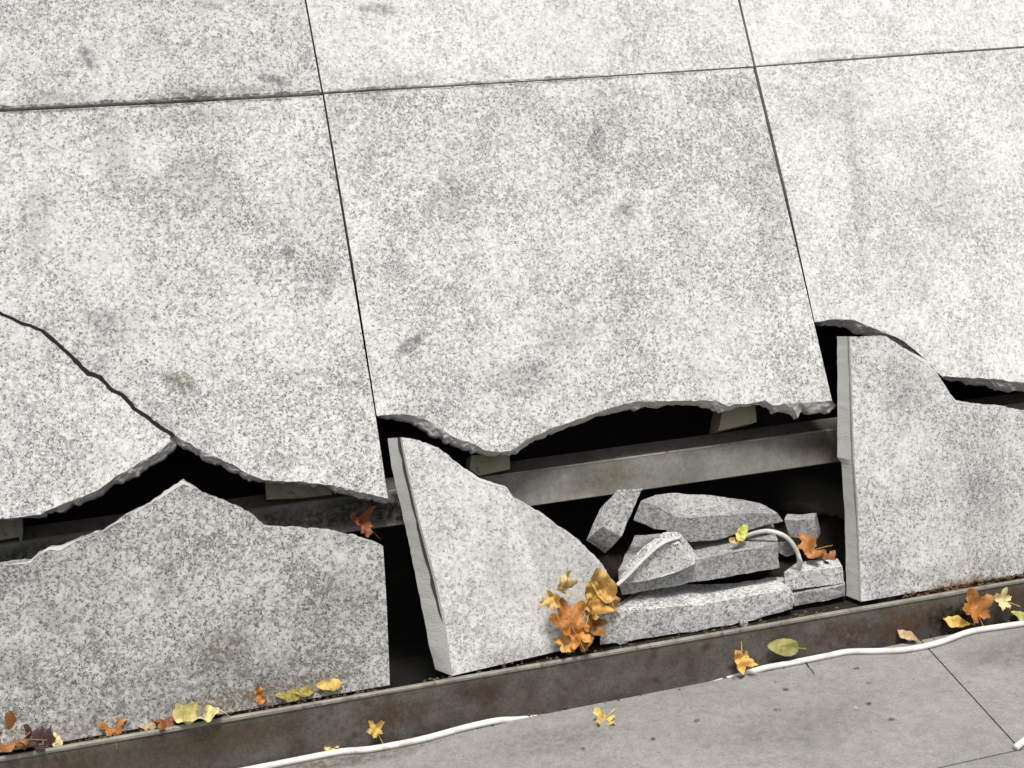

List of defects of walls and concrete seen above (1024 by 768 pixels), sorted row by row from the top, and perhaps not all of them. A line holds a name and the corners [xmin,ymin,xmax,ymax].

spalling [817,319,926,360]
crack [0,312,175,438]
spalling [943,376,1024,391]
spalling [379,400,836,455]
spalling [40,436,388,517]